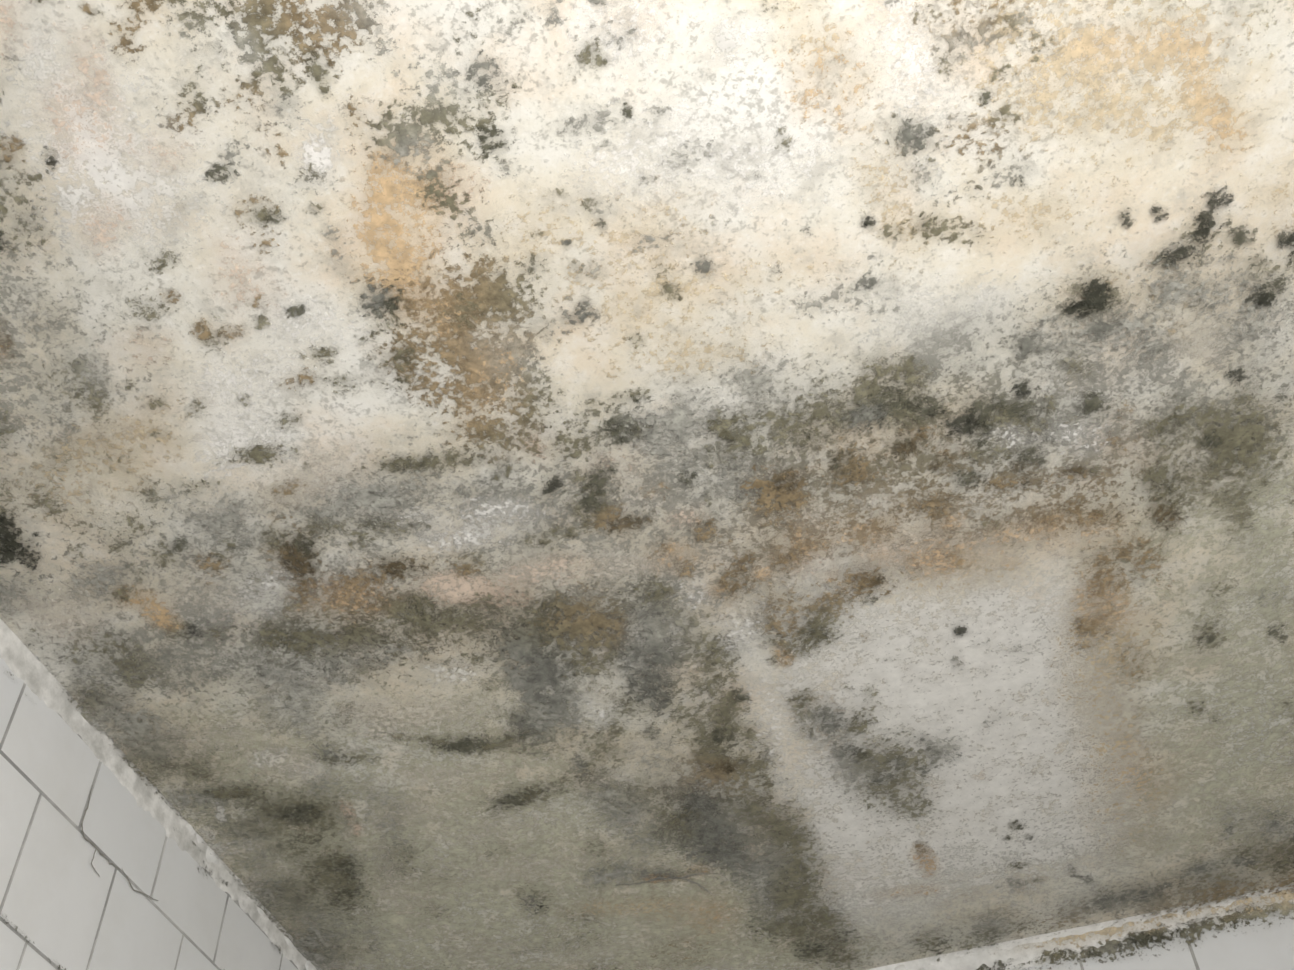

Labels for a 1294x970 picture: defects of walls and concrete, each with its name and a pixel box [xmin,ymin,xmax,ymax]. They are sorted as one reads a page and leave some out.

leakage [495,0,668,67]
leakage [294,103,355,193]
leakage [338,42,522,250]
leakage [557,0,1054,245]
leakage [221,194,286,254]
leakage [1151,206,1169,221]
leakage [655,264,682,301]
leakage [691,261,712,273]
leakage [789,255,901,318]
leakage [120,288,181,350]
leakage [190,313,243,355]
leakage [785,685,962,826]